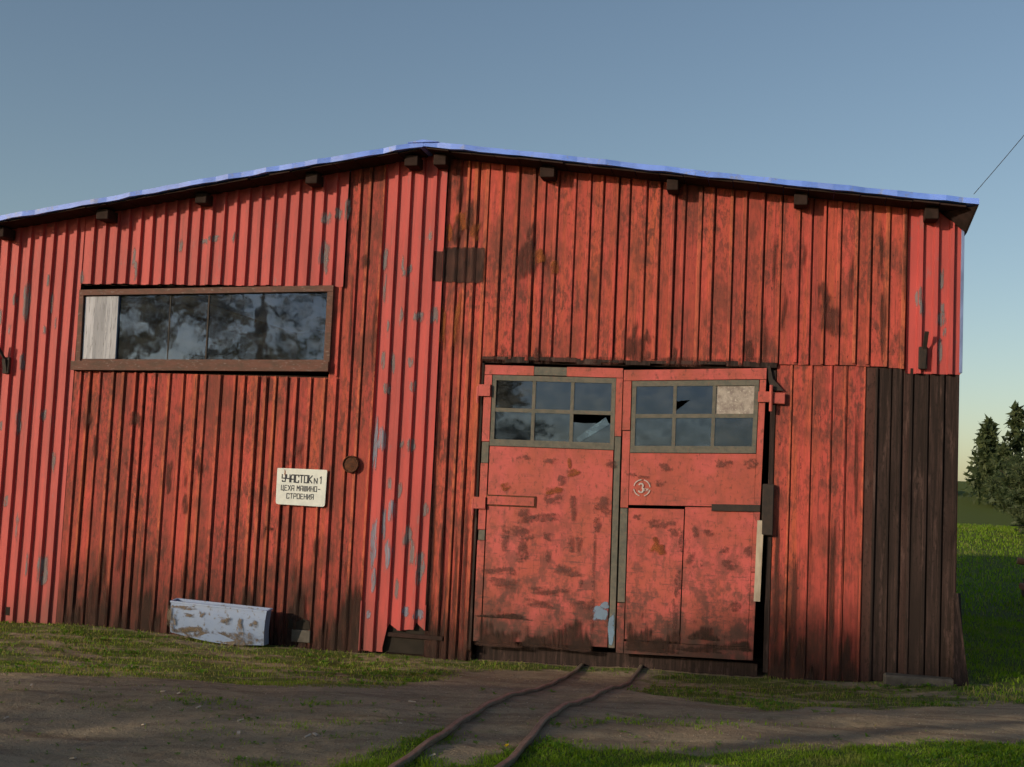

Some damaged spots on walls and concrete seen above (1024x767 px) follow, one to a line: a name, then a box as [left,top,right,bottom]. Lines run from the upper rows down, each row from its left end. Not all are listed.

peeling [321,199,351,224]
damp [452,164,473,245]
damp [516,223,549,277]
peeling [13,285,31,321]
peeling [387,307,438,331]
damp [818,283,839,337]
peeling [938,303,946,365]
peeling [372,416,386,470]
peeling [370,477,425,593]
peeling [482,475,576,589]
peeling [526,496,614,645]
rust [650,537,665,555]